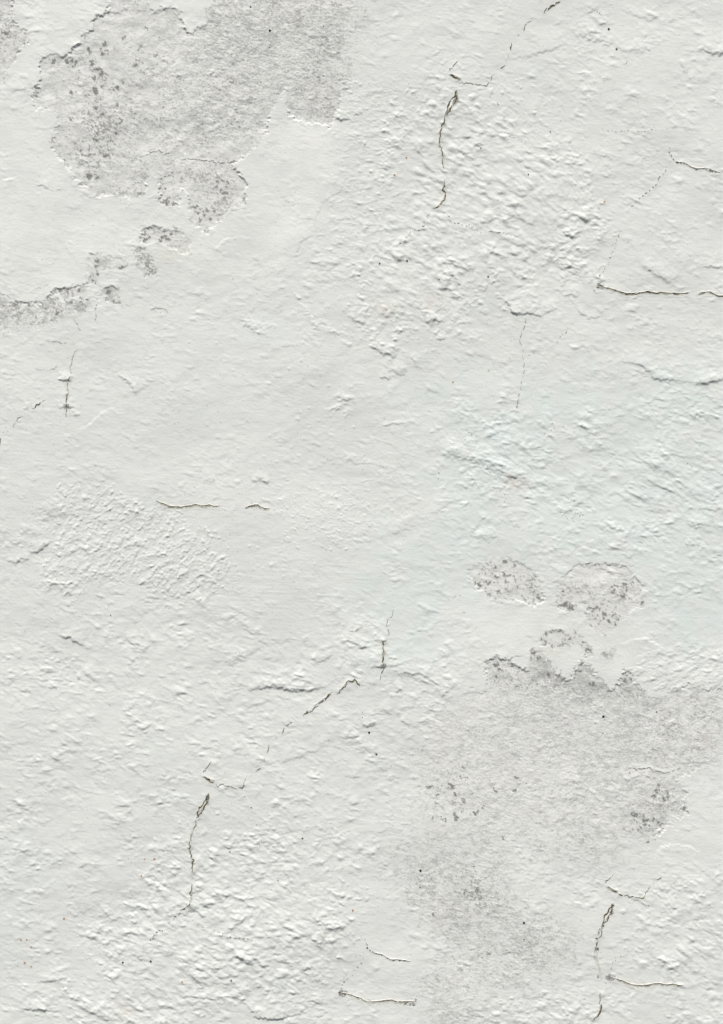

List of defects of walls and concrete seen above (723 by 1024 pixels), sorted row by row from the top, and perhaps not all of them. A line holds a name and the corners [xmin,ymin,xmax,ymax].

peeling [0,0,384,338]
crack [399,0,560,244]
crack [591,129,723,300]
crack [0,305,97,440]
crack [153,496,271,513]
crack [143,614,393,946]
crack [333,939,416,1006]
water stain [338,725,666,1024]
peeling [398,555,723,850]
crack [588,874,686,1023]